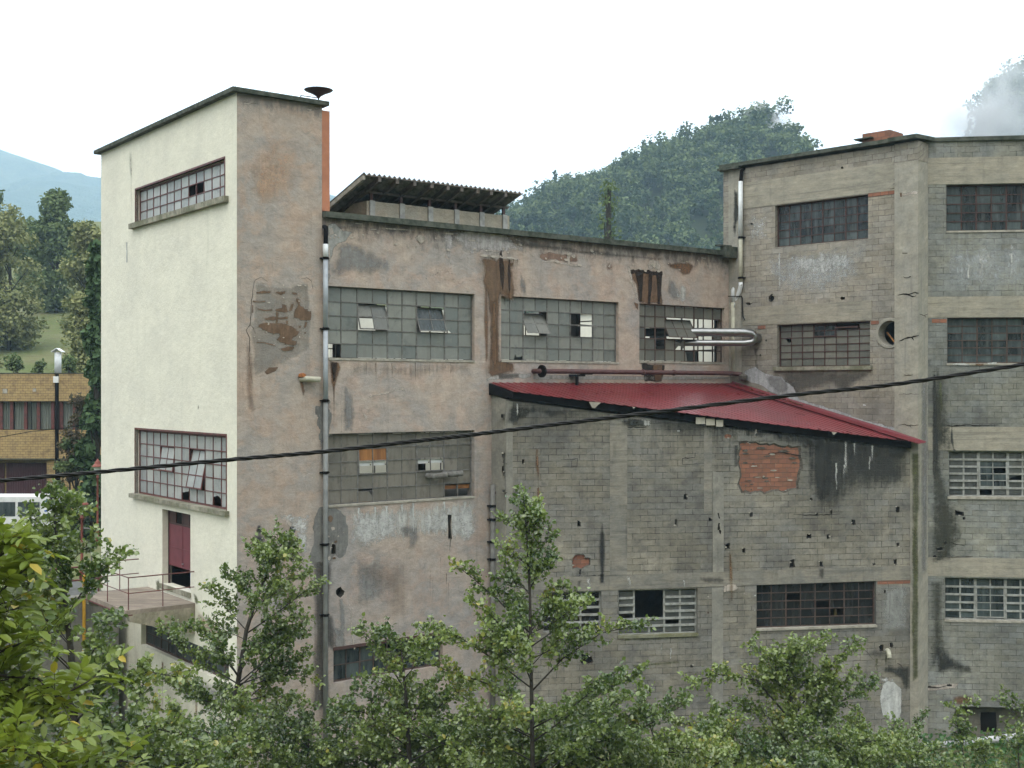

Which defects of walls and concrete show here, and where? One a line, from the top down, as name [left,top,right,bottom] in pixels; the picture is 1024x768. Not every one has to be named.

peeling [539,252,582,267]
flaking render [252,285,311,351]
crack [900,292,927,341]
spalling [724,434,803,494]
damp [811,442,855,497]
damp [922,373,956,570]
spalling [572,554,590,569]